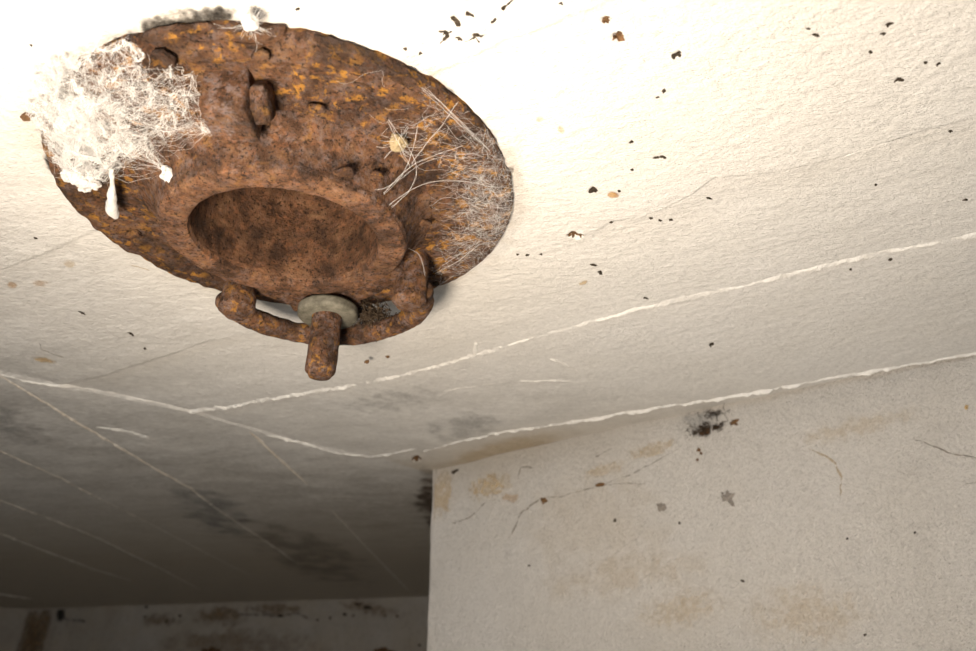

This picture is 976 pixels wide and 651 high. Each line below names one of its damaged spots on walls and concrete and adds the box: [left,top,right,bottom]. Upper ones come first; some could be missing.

rust [147,48,177,69]
crack [913,439,975,458]
crack [510,449,678,536]